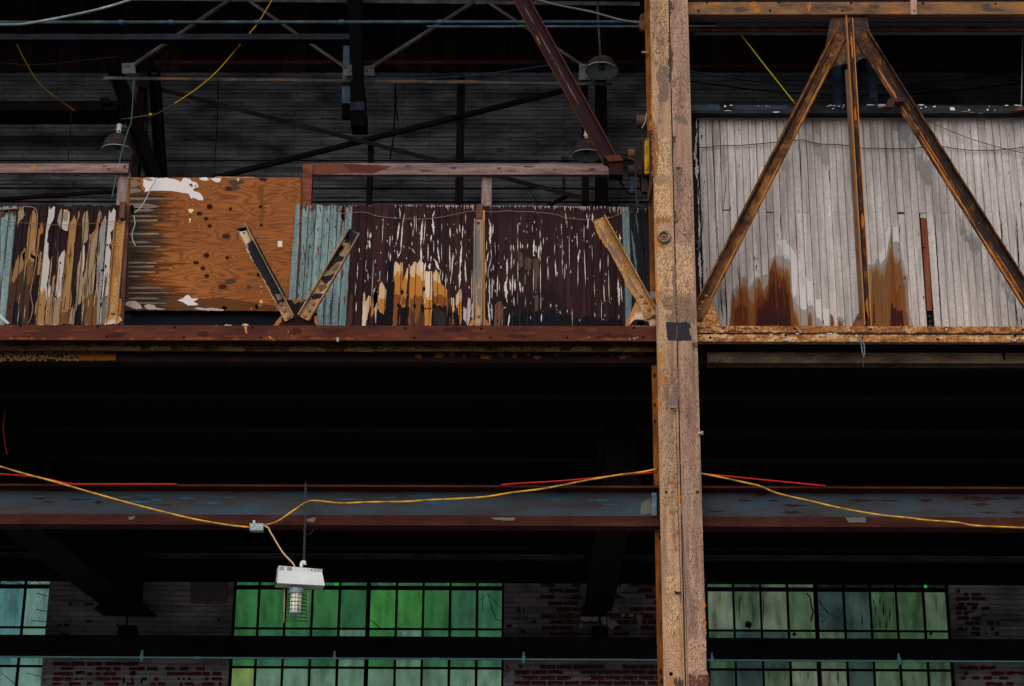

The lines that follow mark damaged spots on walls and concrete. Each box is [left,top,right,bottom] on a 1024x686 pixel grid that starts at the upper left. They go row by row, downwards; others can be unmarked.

peeling [143,176,254,232]
corrosion [877,67,1024,305]
peeling [0,206,116,325]
corrosion [0,328,245,362]
peeling [126,301,163,310]
peeling [177,295,224,311]
peeling [342,208,473,326]
corrosion [262,316,640,359]
peeling [485,222,565,326]
corrosion [697,237,992,334]
corrosion [653,351,725,516]
corrosion [658,523,710,686]